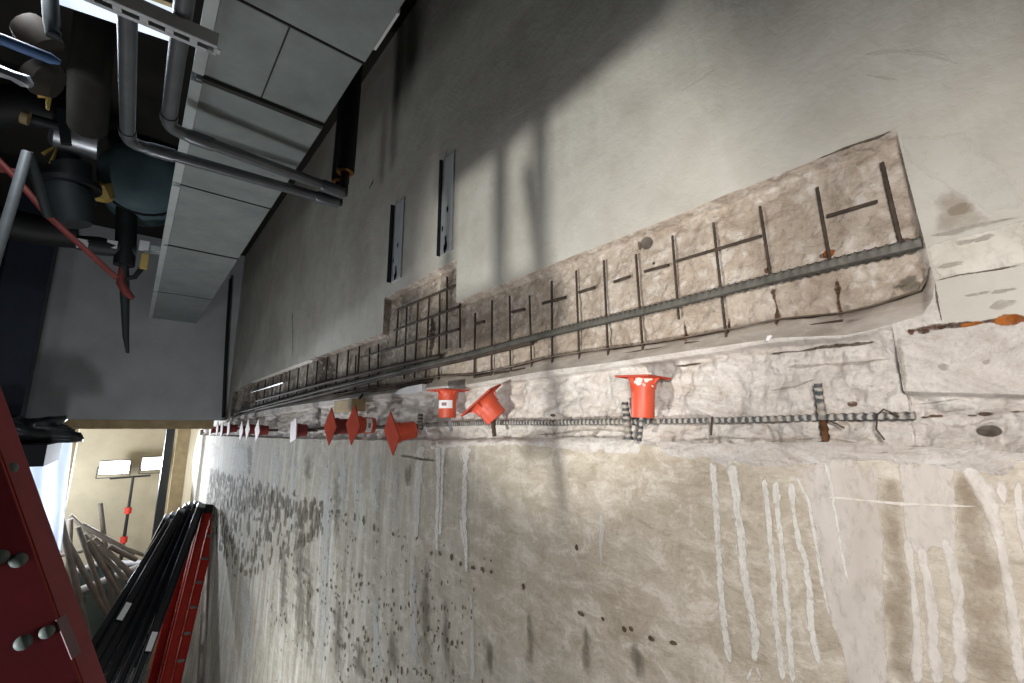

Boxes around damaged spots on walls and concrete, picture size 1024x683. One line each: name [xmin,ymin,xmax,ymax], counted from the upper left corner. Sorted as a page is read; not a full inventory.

spalling [202,130,1024,462]
rust [908,314,1024,335]
leakage [280,461,359,649]
leakage [460,446,471,572]
leakage [709,463,760,680]
leakage [762,459,888,683]
leakage [899,463,1024,683]